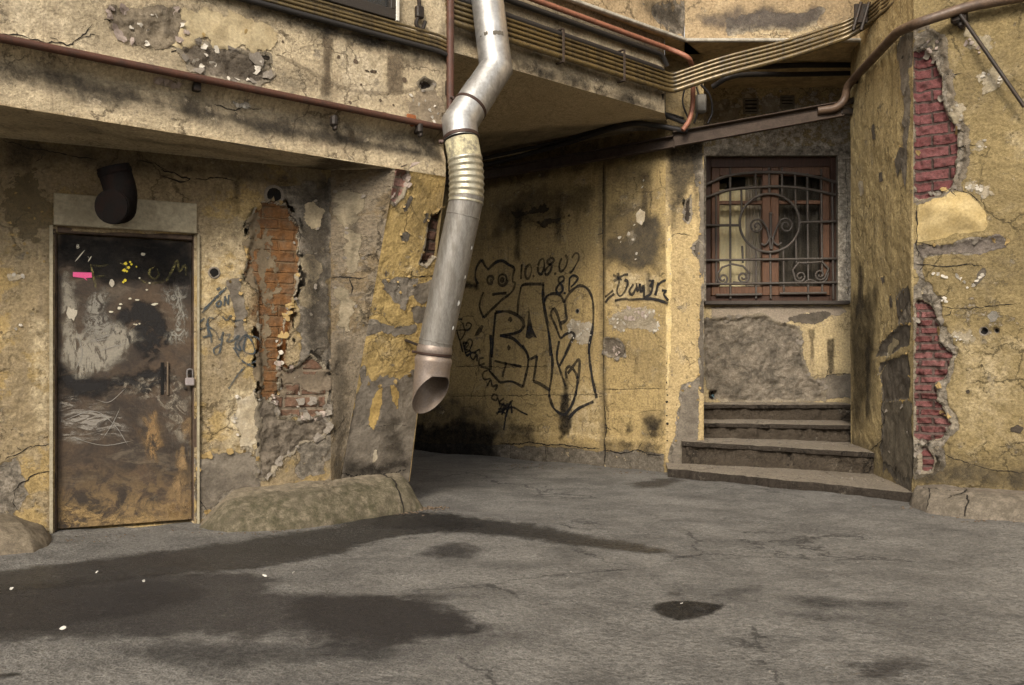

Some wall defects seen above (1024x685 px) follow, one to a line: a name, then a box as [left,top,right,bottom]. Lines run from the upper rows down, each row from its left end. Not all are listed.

crack [2,19,111,46]
peeling [105,3,284,87]
spalling [893,25,996,205]
spalling [390,162,420,213]
spalling [363,206,445,337]
crack [915,208,982,271]
peeling [932,268,986,289]
crack [942,303,1016,317]
spalling [195,199,334,517]
spalling [671,307,851,463]
spalling [876,274,976,483]
crack [923,452,1024,516]